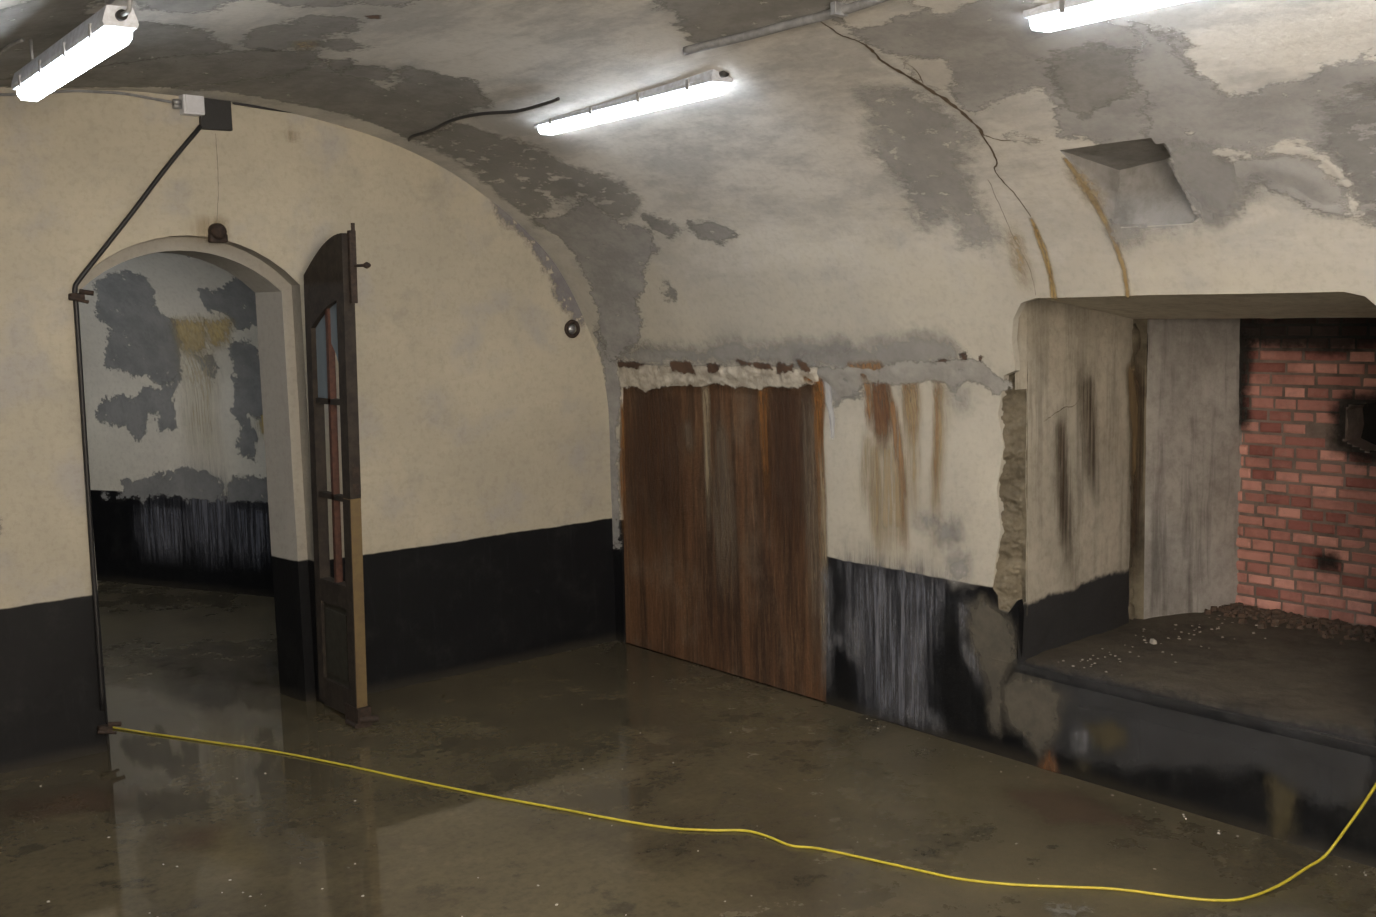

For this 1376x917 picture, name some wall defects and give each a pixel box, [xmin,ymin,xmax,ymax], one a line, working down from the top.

peeling [0,0,105,88]
peeling [132,0,238,14]
peeling [60,14,364,88]
peeling [270,0,419,8]
crack [821,21,1042,295]
peeling [653,0,1376,227]
peeling [93,269,268,507]
leakage [141,494,269,559]
corrosion [619,376,827,702]
peeling [171,58,1374,809]
corrosion [864,380,942,528]
leakage [823,560,944,725]